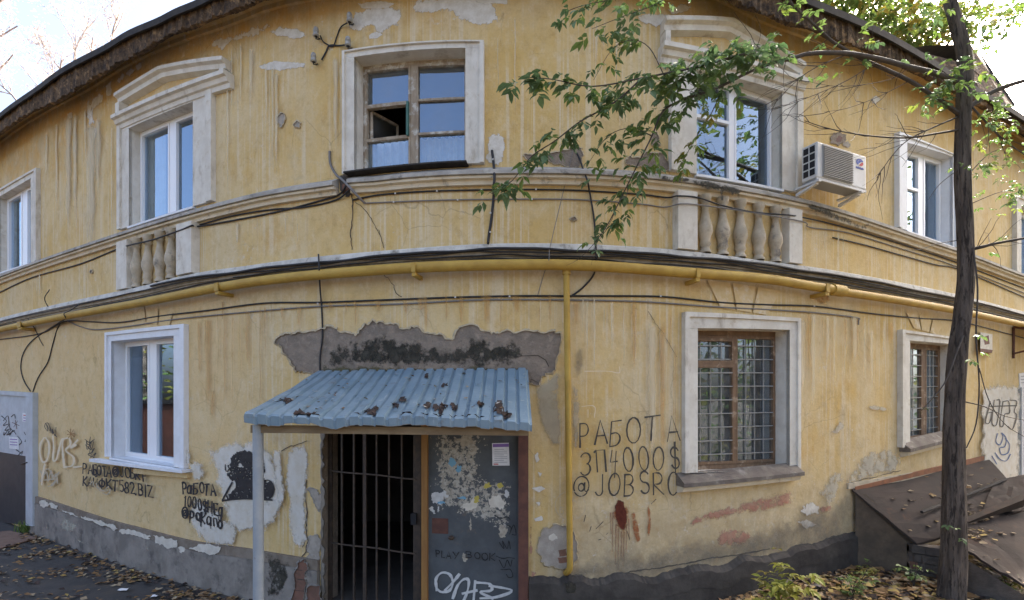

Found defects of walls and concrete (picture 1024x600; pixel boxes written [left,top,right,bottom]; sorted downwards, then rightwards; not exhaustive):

peeling [349,1,401,39]
peeling [413,0,507,25]
peeling [259,61,305,71]
flaking render [273,318,563,387]
peeling [39,500,221,555]
peeling [286,447,322,600]
flaking render [530,453,579,576]
rust [614,500,651,541]
peeling [691,493,790,525]
peeling [798,450,898,529]